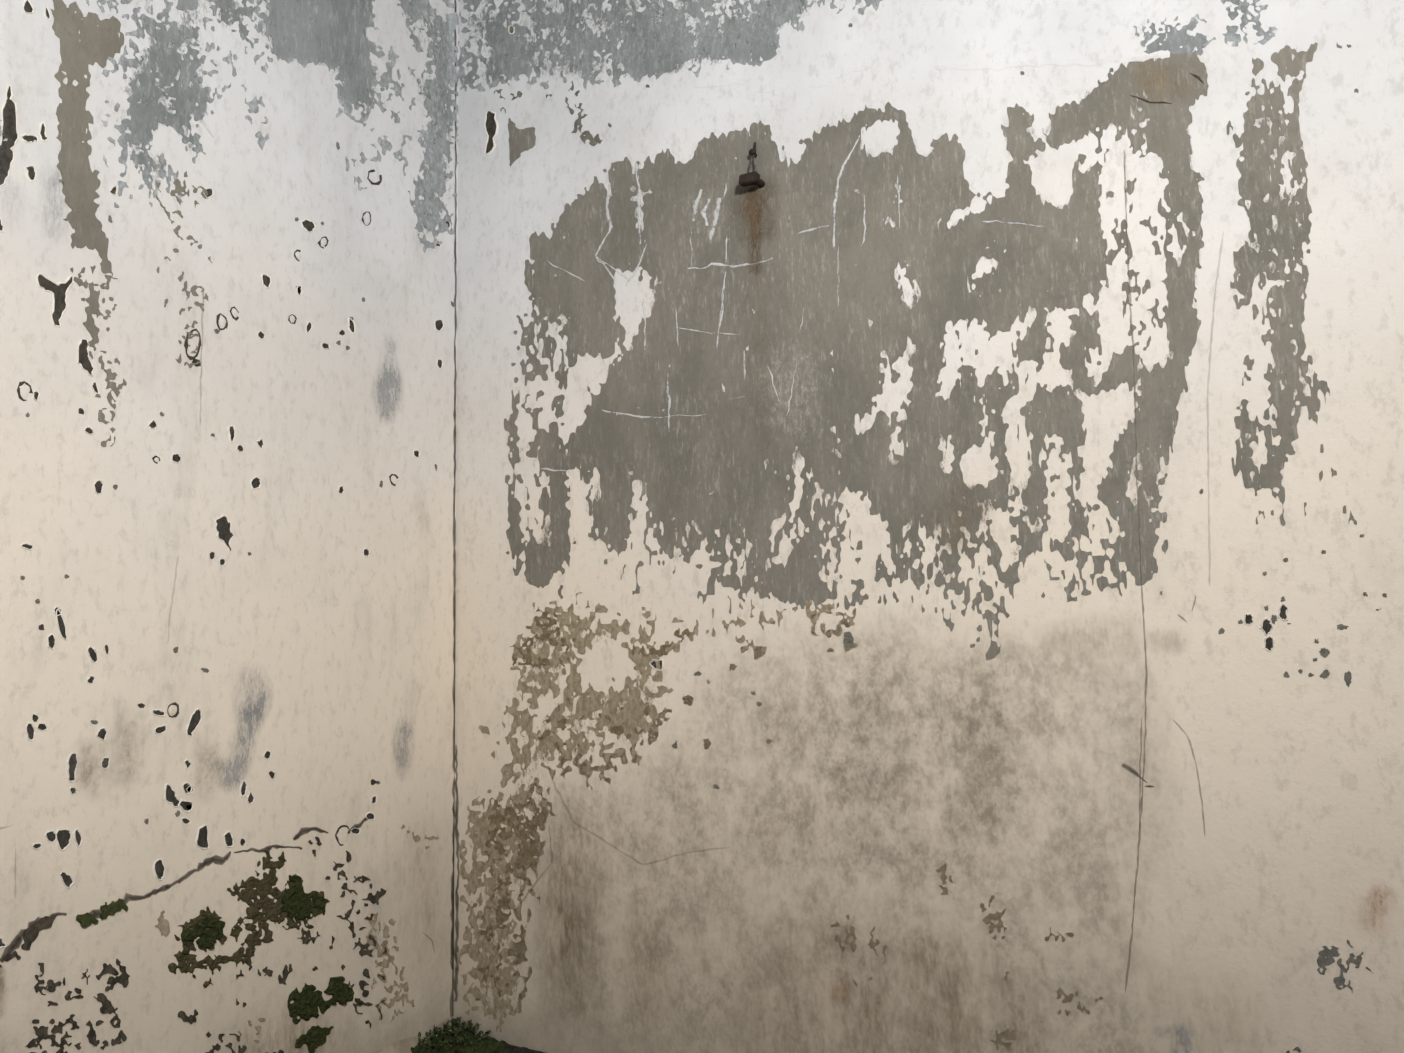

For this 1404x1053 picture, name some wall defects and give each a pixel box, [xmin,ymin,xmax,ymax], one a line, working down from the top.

peeling [210,514,252,566]
peeling [455,0,1330,1032]
peeling [35,599,68,650]
peeling [164,759,245,850]
peeling [32,828,83,851]
crack [0,817,368,963]
peeling [0,915,56,968]
damp [301,932,335,949]
damp [325,851,387,1028]
damp [236,960,293,985]
damp [27,959,130,1053]
damp [178,1009,247,1053]